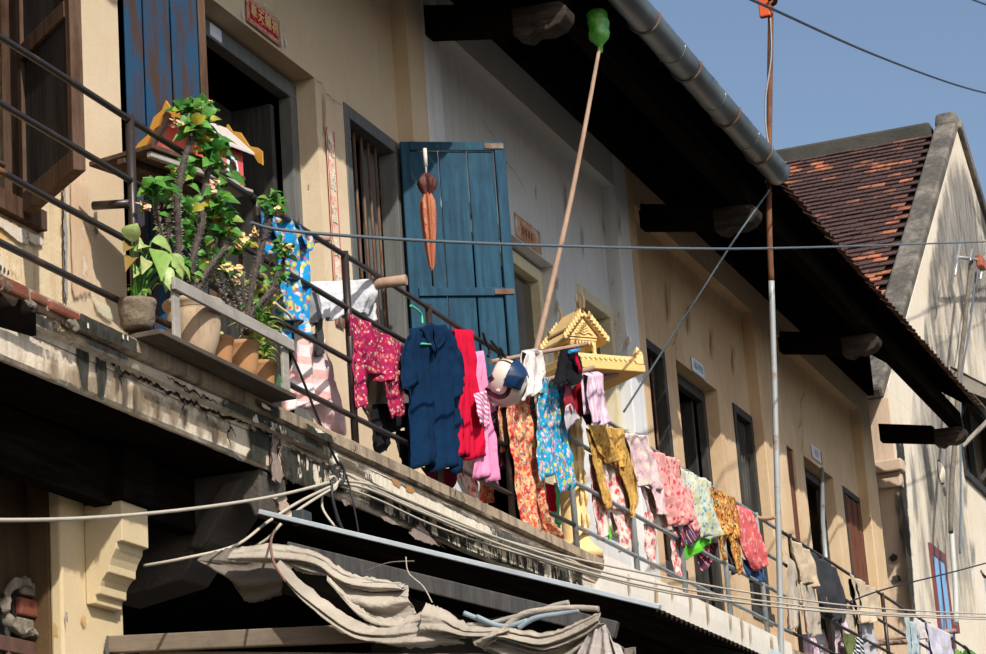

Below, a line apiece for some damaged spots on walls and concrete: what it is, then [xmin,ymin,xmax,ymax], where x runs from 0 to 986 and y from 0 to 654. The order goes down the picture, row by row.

peeling [0,178,112,341]
water stain [925,169,986,366]
water stain [50,314,271,466]
crack [105,359,271,447]
water stain [256,399,281,418]
peeling [221,400,334,486]
water stain [306,424,336,445]
water stain [921,401,948,429]
water stain [281,446,583,586]
water stain [897,444,975,614]